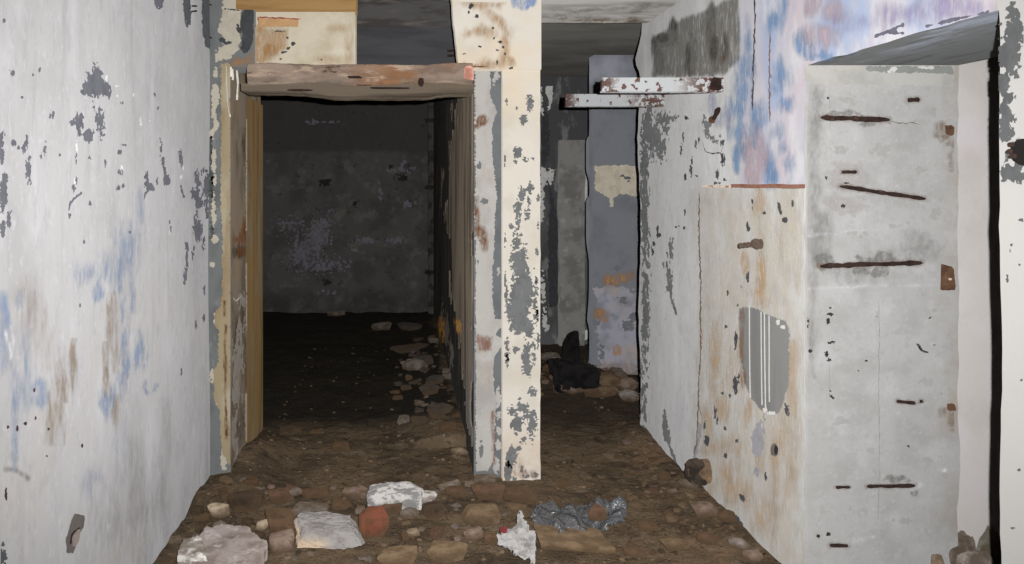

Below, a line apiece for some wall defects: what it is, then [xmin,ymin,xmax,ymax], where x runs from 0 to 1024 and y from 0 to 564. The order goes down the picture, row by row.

peeling [70,62,134,163]
peeling [104,144,127,190]
flaking render [144,0,254,470]
flaking render [439,27,554,481]
peeling [585,107,727,429]
peeling [662,409,677,463]
peeling [721,290,790,481]